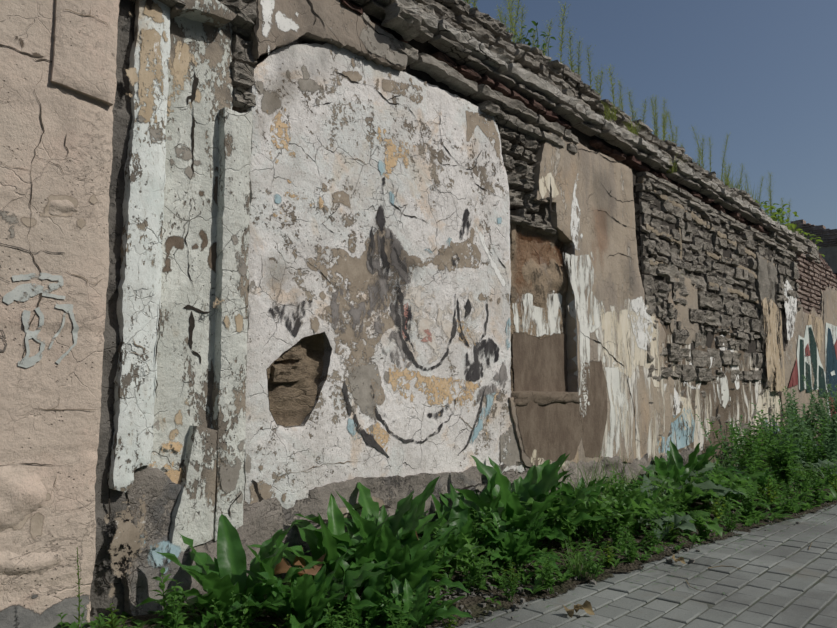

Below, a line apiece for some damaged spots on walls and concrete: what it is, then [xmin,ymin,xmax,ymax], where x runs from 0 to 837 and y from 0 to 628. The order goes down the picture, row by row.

crack [0,44,90,273]
crack [129,0,137,41]
peeling [126,0,201,179]
flaking render [337,13,427,104]
crack [334,71,501,203]
flaking render [163,229,217,273]
crack [17,293,42,388]
peeling [267,208,507,452]
flaking render [499,172,797,481]
crack [30,404,115,422]
crack [0,462,68,493]
flaking render [104,486,181,600]